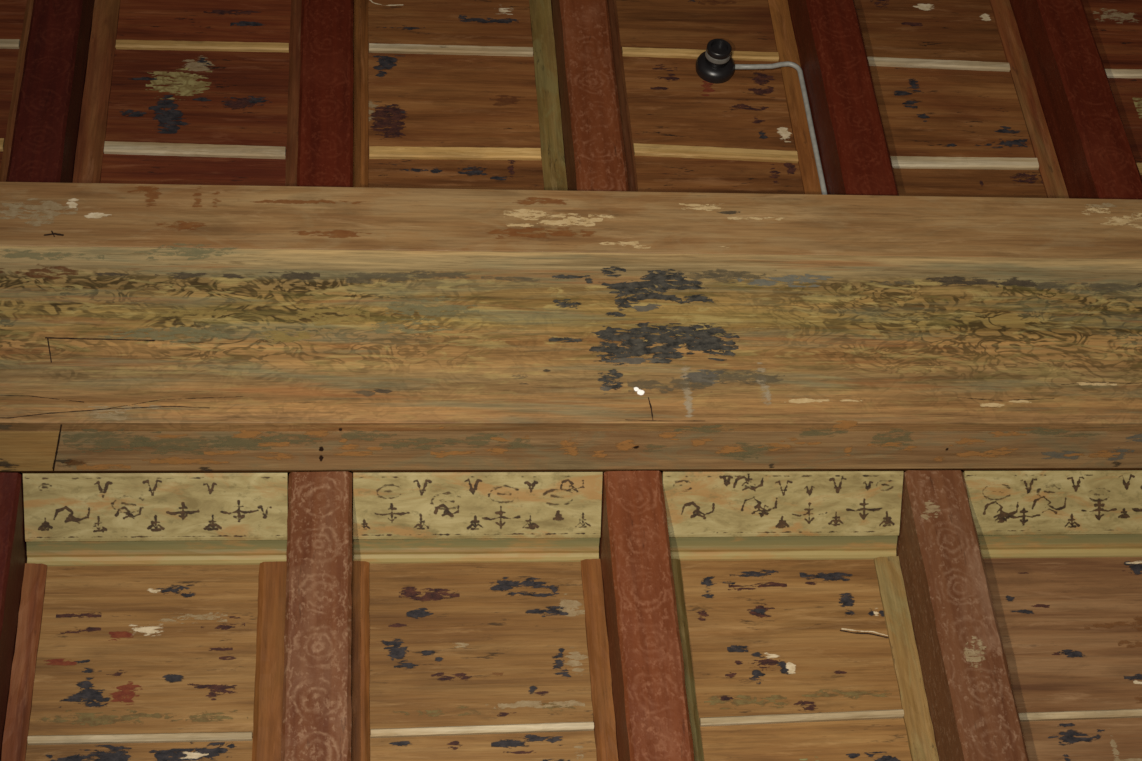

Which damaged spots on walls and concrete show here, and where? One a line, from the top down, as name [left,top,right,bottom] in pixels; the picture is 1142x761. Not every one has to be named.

peeling [119,55,269,134]
peeling [549,266,779,395]
peeling [489,577,585,617]
peeling [697,570,787,621]
peeling [800,572,855,616]
peeling [56,612,245,640]
peeling [382,587,472,680]
peeling [38,659,248,726]
peeling [704,645,892,711]
peeling [46,745,131,761]
peeling [150,742,237,761]
peeling [491,734,583,761]